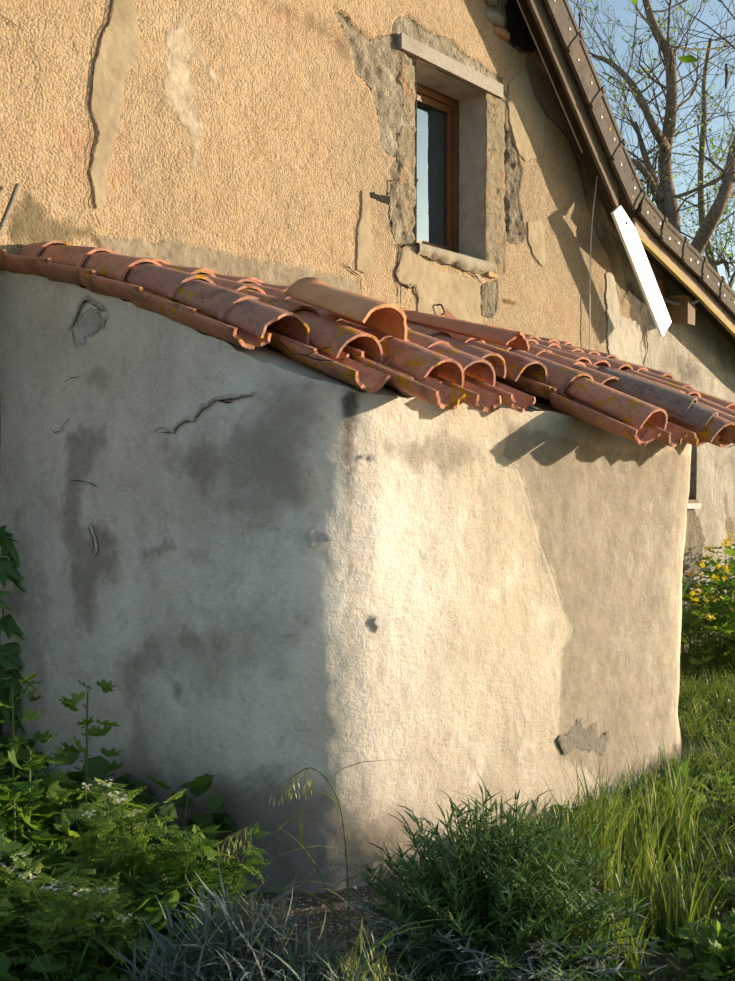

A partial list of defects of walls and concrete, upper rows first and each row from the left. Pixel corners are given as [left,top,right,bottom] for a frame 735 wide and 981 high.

spalling [335,13,524,318]